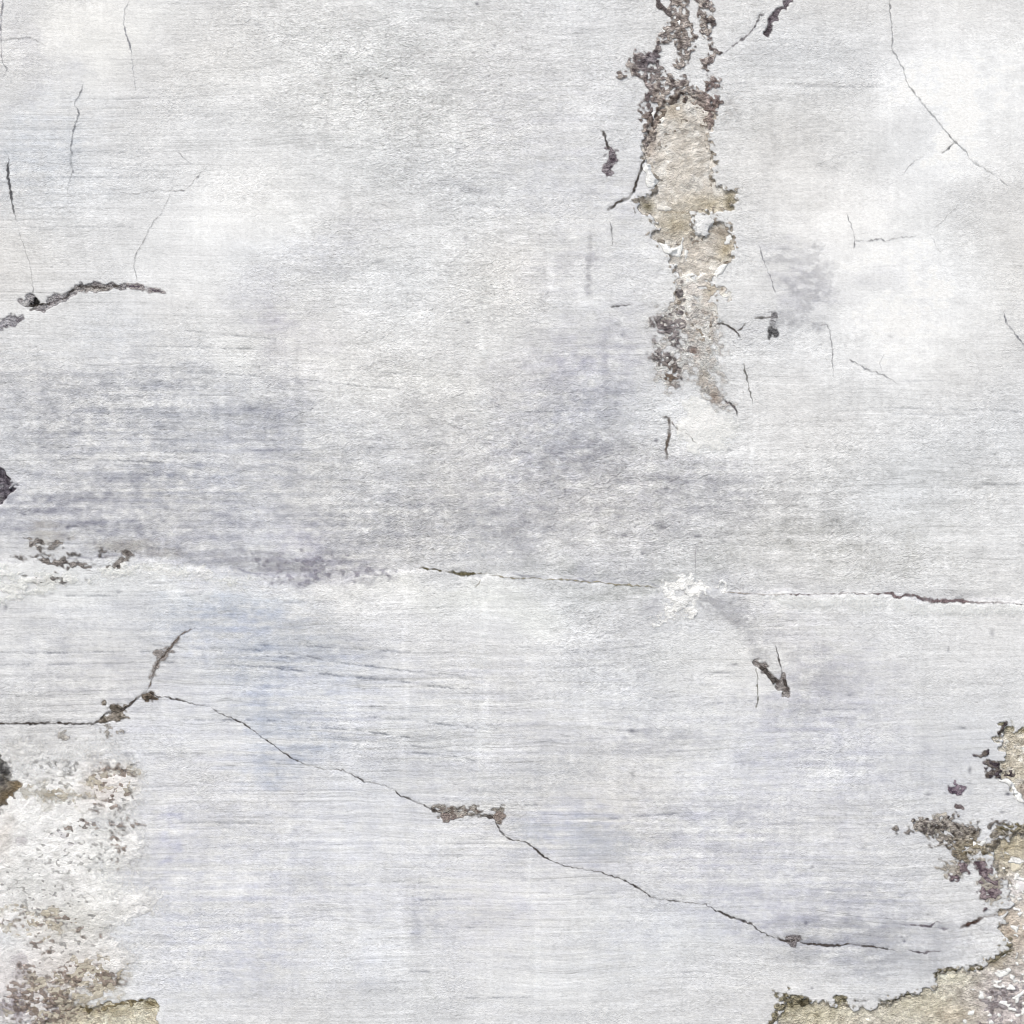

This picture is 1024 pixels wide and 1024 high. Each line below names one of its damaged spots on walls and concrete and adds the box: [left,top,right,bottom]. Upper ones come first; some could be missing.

peeling [616,0,739,455]
crack [29,285,161,307]
peeling [15,537,134,584]
crack [422,567,649,587]
crack [790,592,994,604]
crack [0,629,191,725]
spalling [752,658,790,698]
peeling [973,721,1024,803]
spalling [0,700,168,1024]
crack [396,792,888,950]
peeling [768,780,1024,1024]
crack [963,917,982,927]